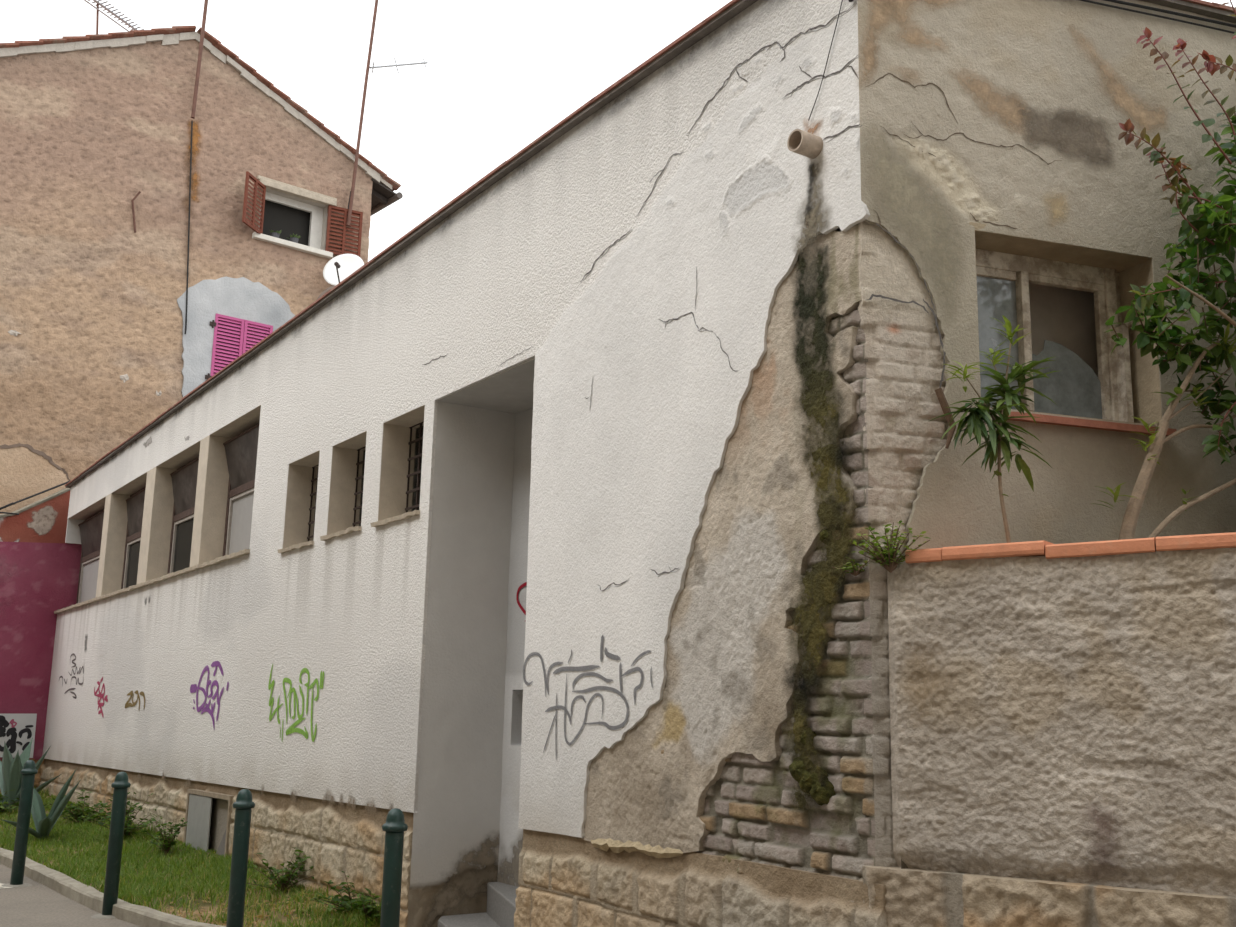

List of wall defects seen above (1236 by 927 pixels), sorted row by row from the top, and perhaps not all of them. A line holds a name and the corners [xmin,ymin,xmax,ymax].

crack [580,4,1062,284]
water stain [962,77,1112,164]
water stain [797,164,828,251]
crack [659,268,736,372]
peeling [581,219,949,881]